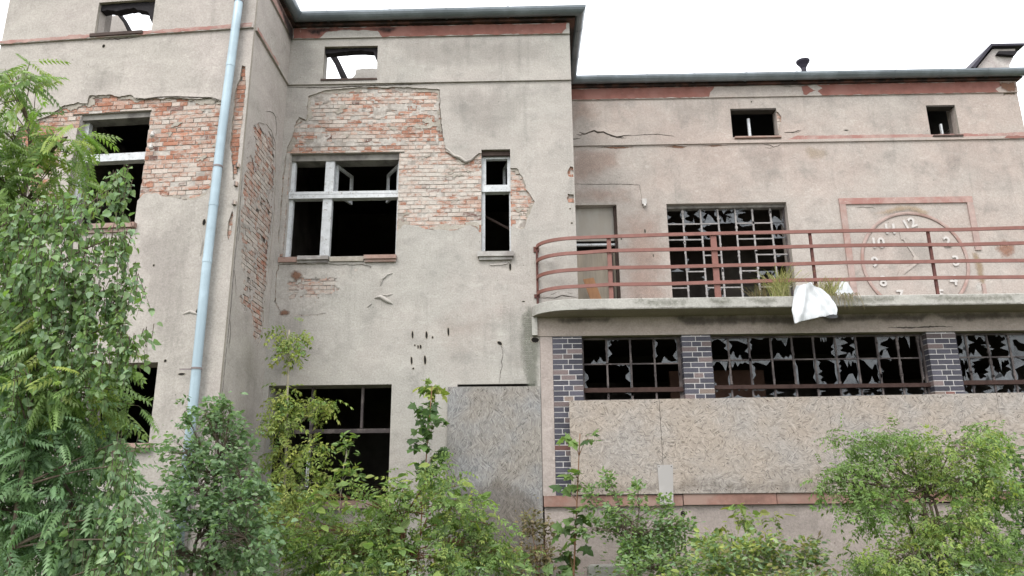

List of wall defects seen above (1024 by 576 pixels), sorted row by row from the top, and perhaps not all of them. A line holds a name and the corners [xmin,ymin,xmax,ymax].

peeling [571,86,714,100]
peeling [801,82,1014,96]
flaking render [18,95,221,202]
crack [573,127,670,140]
flaking render [228,67,493,345]
flaking render [510,169,534,229]